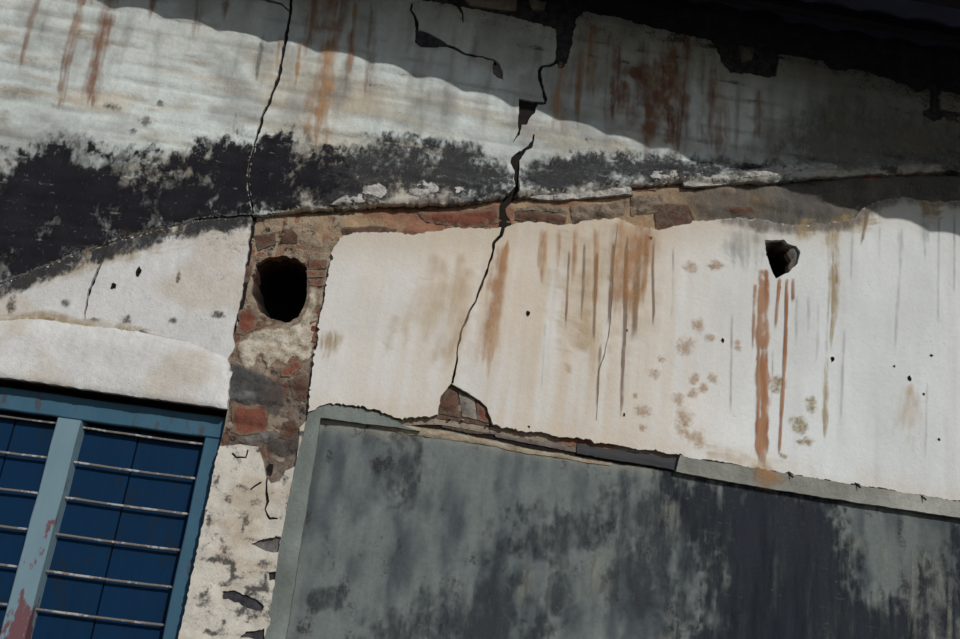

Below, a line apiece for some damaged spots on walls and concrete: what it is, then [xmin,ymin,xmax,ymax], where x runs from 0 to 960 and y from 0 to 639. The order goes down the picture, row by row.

corrosion [87,16,112,101]
crack [85,243,110,315]
crack [233,0,293,336]
spalling [222,183,397,483]
leakage [0,131,772,326]
corrosion [485,242,508,343]
crack [451,60,558,383]
spalling [371,385,678,473]
leakage [608,241,640,405]
corrosion [752,270,795,480]
spalling [765,243,798,278]
leakage [526,468,960,639]